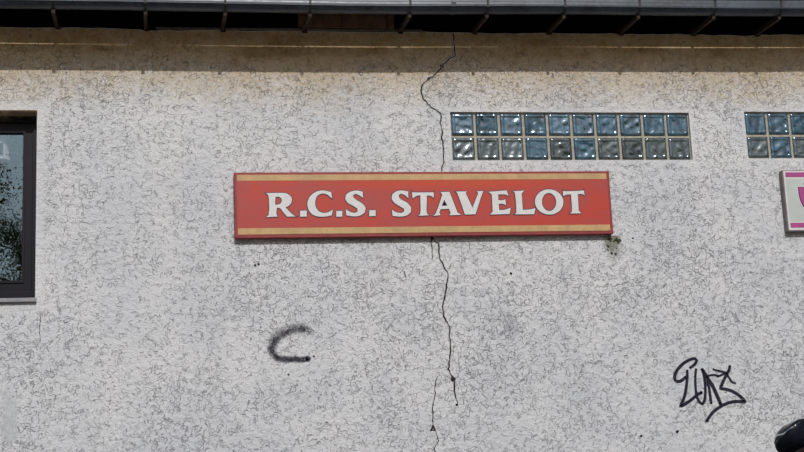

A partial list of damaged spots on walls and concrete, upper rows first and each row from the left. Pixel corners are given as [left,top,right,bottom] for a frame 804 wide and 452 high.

crack [420,34,456,172]
crack [431,237,458,452]